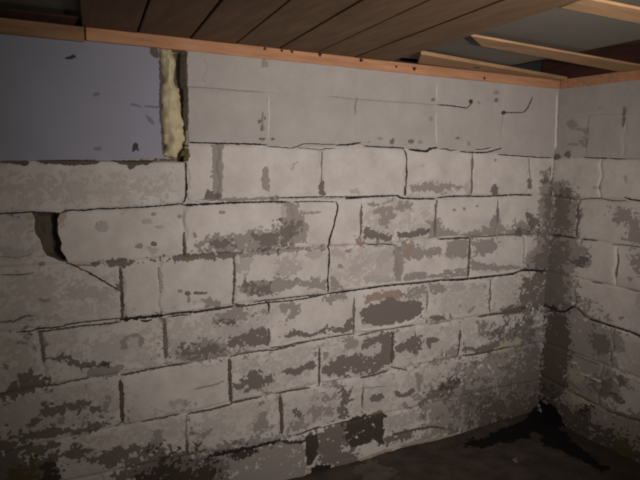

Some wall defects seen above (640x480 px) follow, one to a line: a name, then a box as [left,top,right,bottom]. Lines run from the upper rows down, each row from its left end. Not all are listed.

crack [501,97,533,127]
crack [0,142,571,333]
water stain [0,119,640,480]
crack [544,305,640,337]